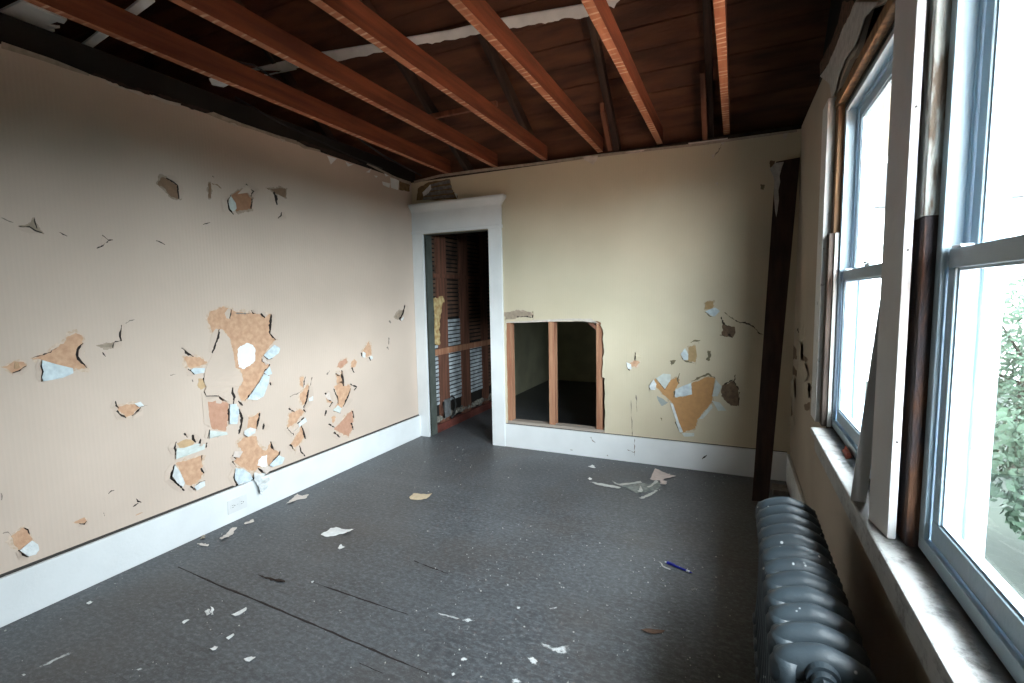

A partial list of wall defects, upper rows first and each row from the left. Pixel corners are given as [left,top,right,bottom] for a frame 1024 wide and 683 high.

flaking render [1,42,797,201]
peeling [206,176,287,221]
peeling [504,310,533,322]
peeling [0,329,90,382]
peeling [110,401,147,421]
peeling [165,305,373,494]
peeling [649,340,740,437]
peeling [4,525,39,560]